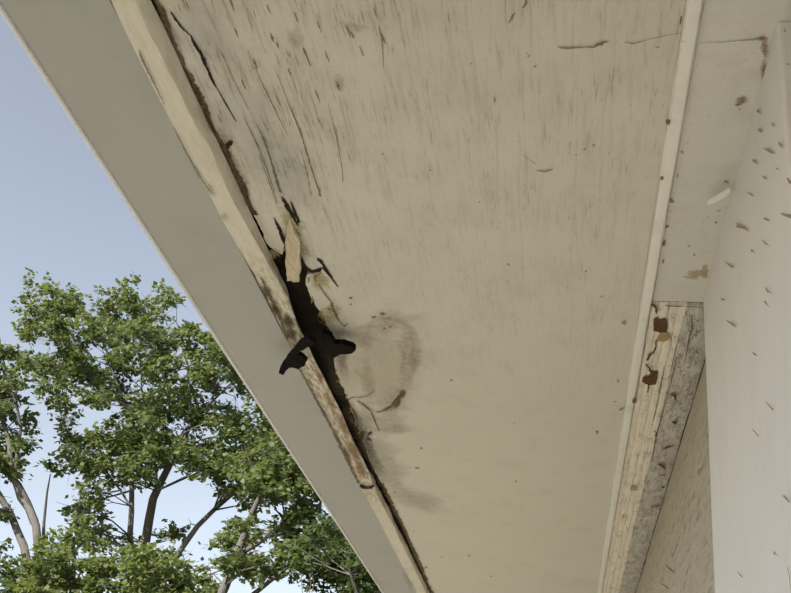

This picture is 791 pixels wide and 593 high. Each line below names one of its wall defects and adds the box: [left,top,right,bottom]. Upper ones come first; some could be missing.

crack [347,391,404,431]
crack [381,483,434,593]